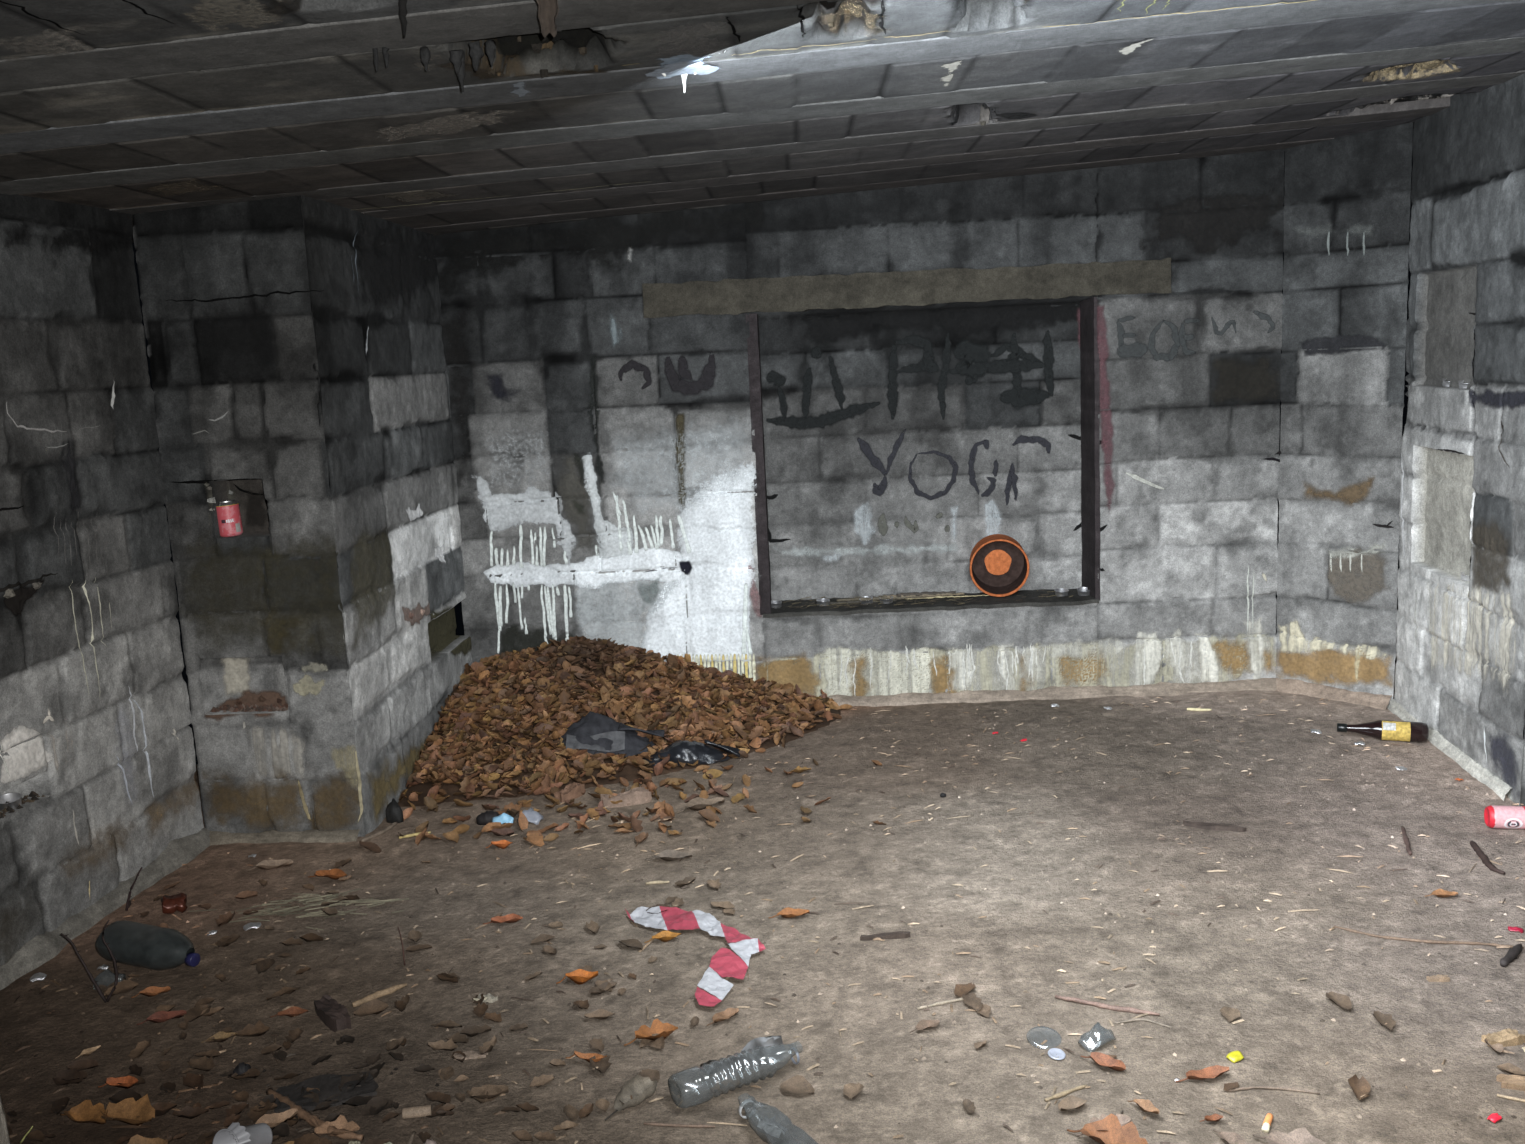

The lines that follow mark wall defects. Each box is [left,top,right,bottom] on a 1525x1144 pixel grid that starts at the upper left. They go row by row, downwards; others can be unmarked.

spalling [824,0,878,31]
spalling [442,33,608,79]
spalling [1363,60,1459,82]
water stain [641,582,658,602]
water stain [813,566,1386,697]
water stain [243,722,311,820]
water stain [336,747,363,822]